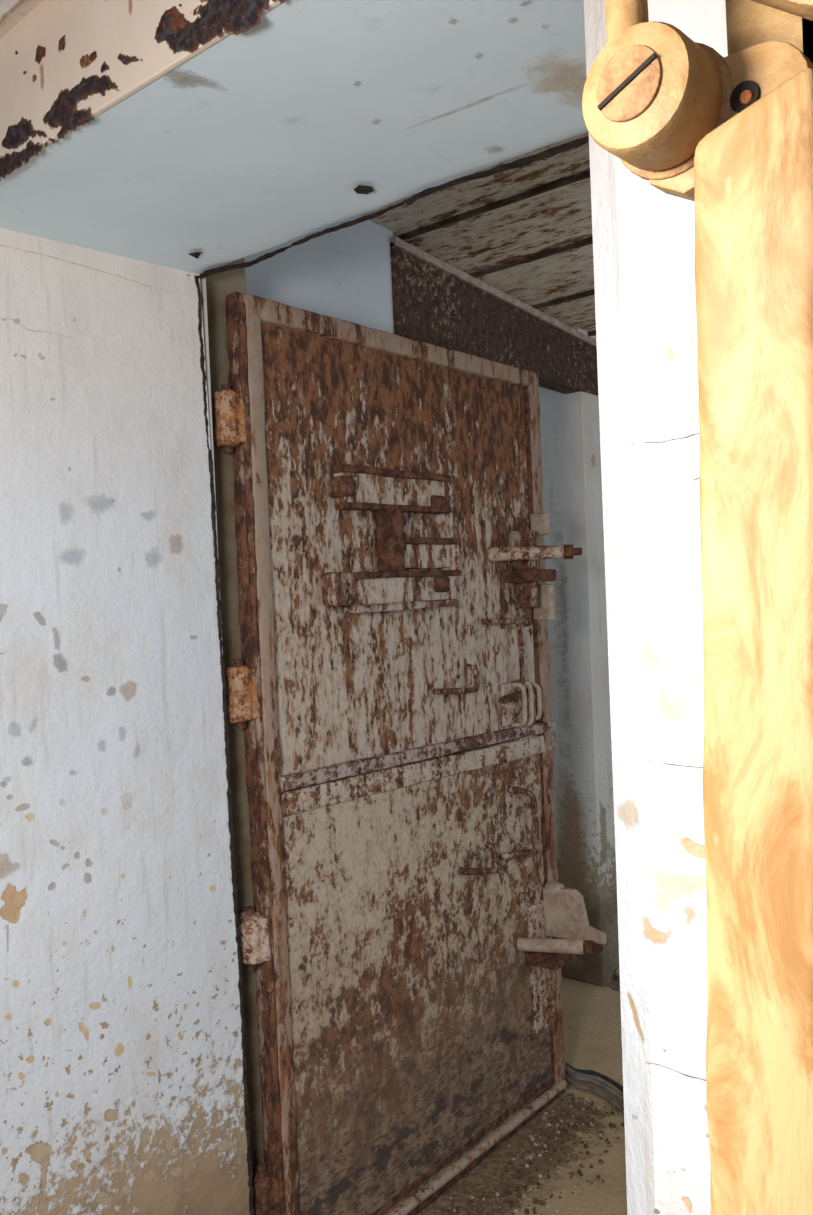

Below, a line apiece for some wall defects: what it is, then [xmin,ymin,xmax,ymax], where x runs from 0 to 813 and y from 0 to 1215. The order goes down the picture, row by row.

rust [154,0,262,54]
rust [23,35,66,86]
rust [0,51,143,181]
crack [630,433,700,444]
crack [640,759,703,769]
peeling [621,803,637,824]
peeling [678,838,705,858]
peeling [628,994,643,1041]
crack [645,1062,706,1081]